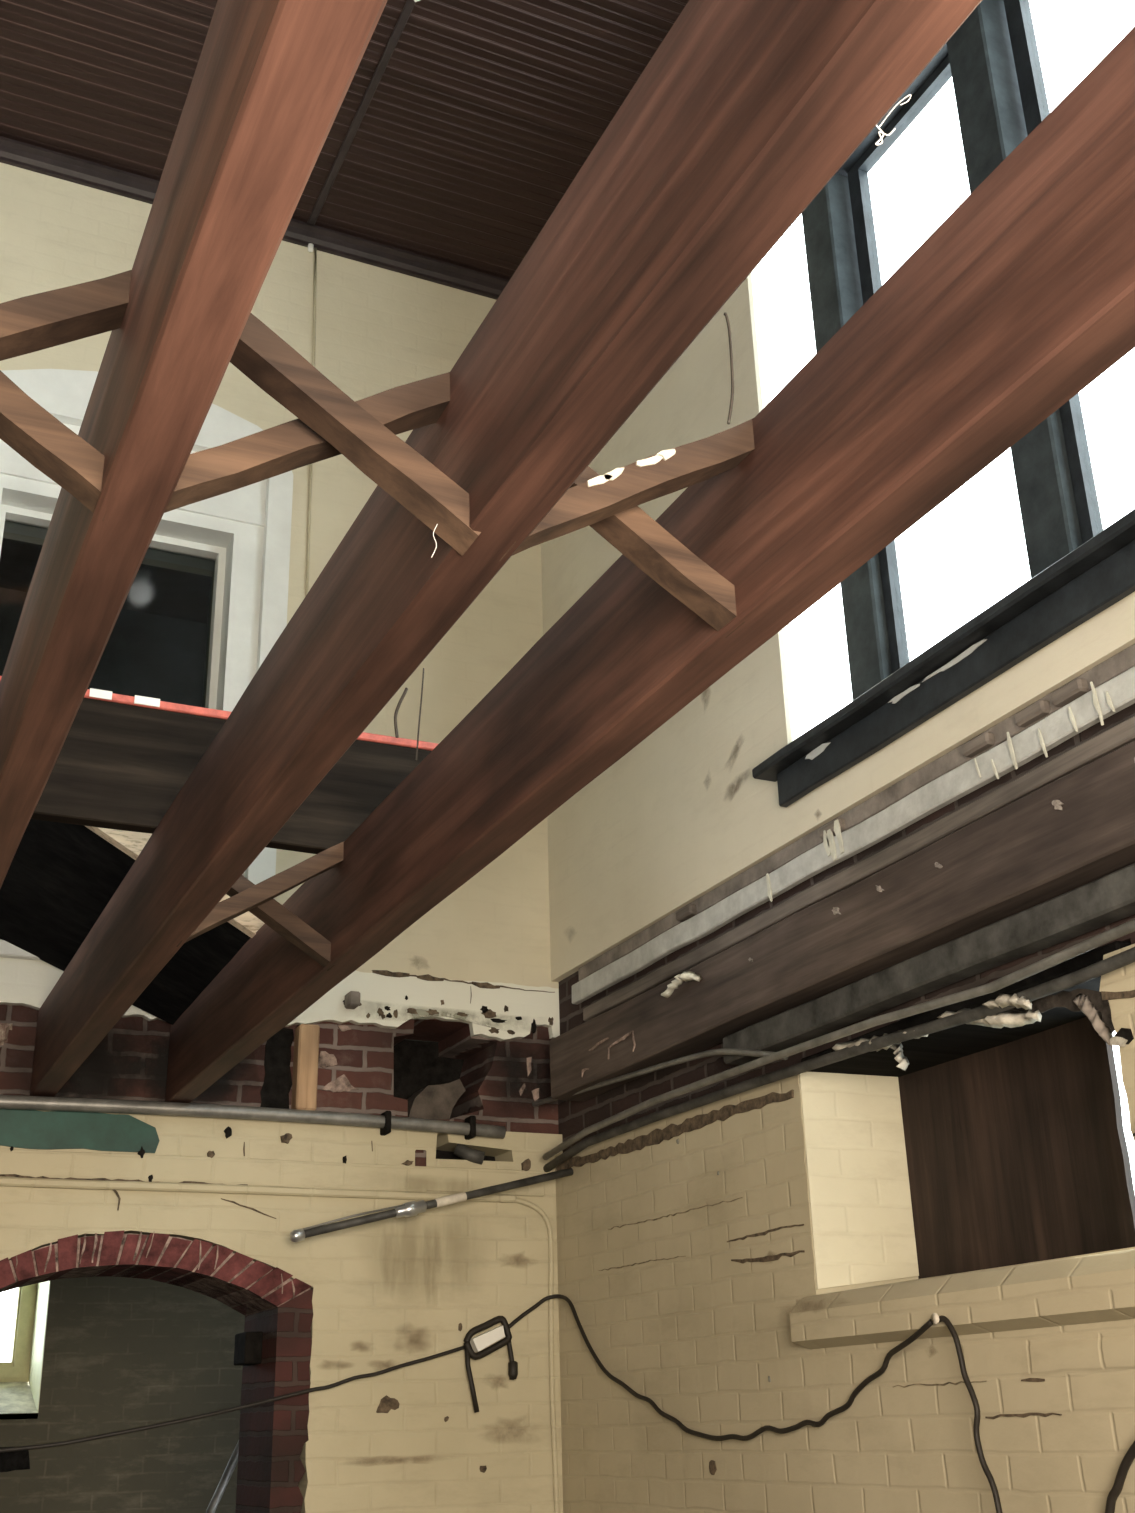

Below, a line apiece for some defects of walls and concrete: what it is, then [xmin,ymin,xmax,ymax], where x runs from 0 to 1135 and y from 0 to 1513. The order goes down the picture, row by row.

peeling [343,995,553,1035]
spalling [394,1040,466,1120]
crack [610,1197,743,1230]
crack [727,1224,805,1263]
crack [598,1256,685,1271]